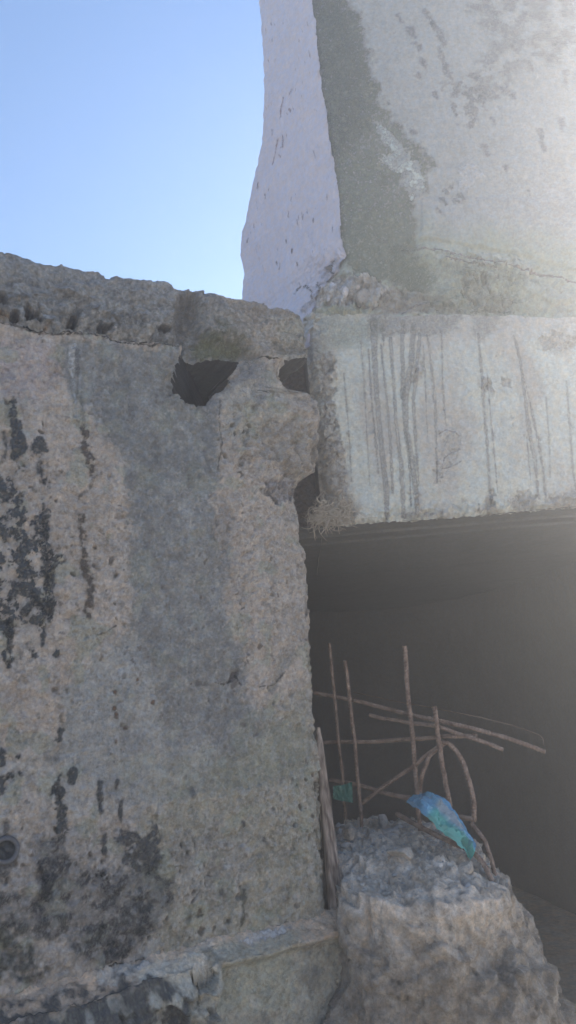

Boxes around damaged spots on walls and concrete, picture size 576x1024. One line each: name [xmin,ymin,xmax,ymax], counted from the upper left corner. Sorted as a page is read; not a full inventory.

damp [312,0,512,303]
damp [3,399,49,484]
damp [68,343,95,487]
spalling [156,291,207,407]
spalling [300,254,513,315]
damp [361,314,460,519]
damp [477,335,497,505]
damp [515,341,546,499]
damp [0,476,63,668]
damp [79,513,95,618]
damp [0,747,22,796]
damp [0,766,172,981]